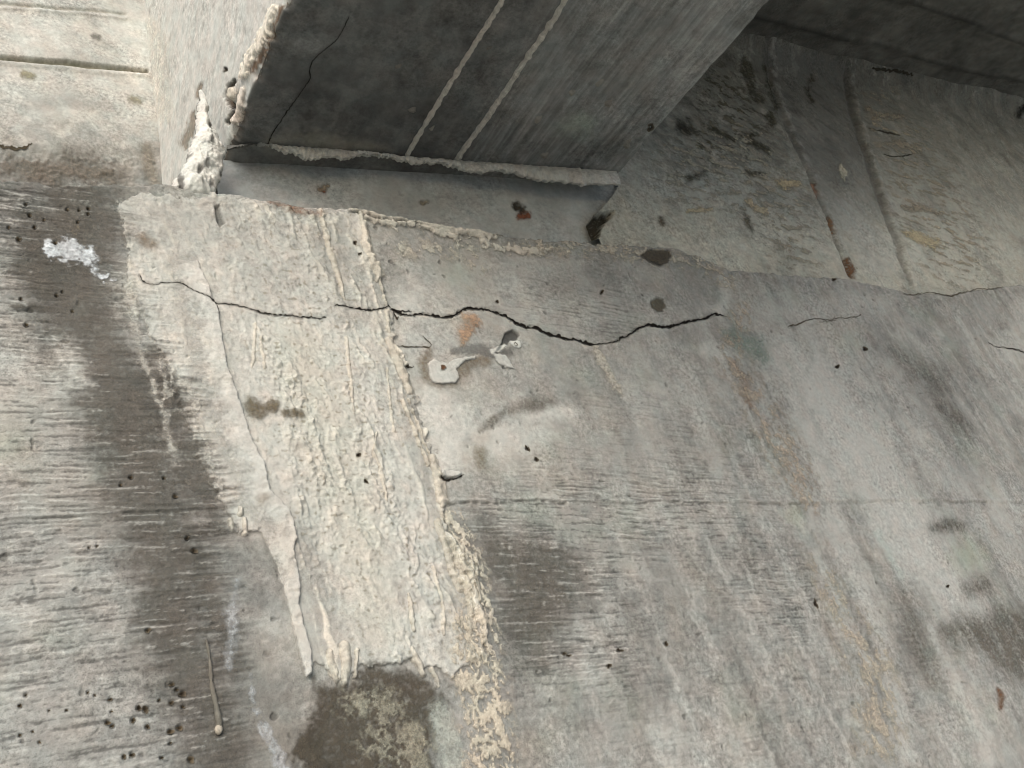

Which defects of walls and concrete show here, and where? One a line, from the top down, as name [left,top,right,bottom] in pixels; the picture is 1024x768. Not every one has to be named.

crack [267,17,349,144]
crack [140,275,727,368]
peeling [420,331,521,386]
crack [788,314,861,327]
water stain [0,143,577,768]